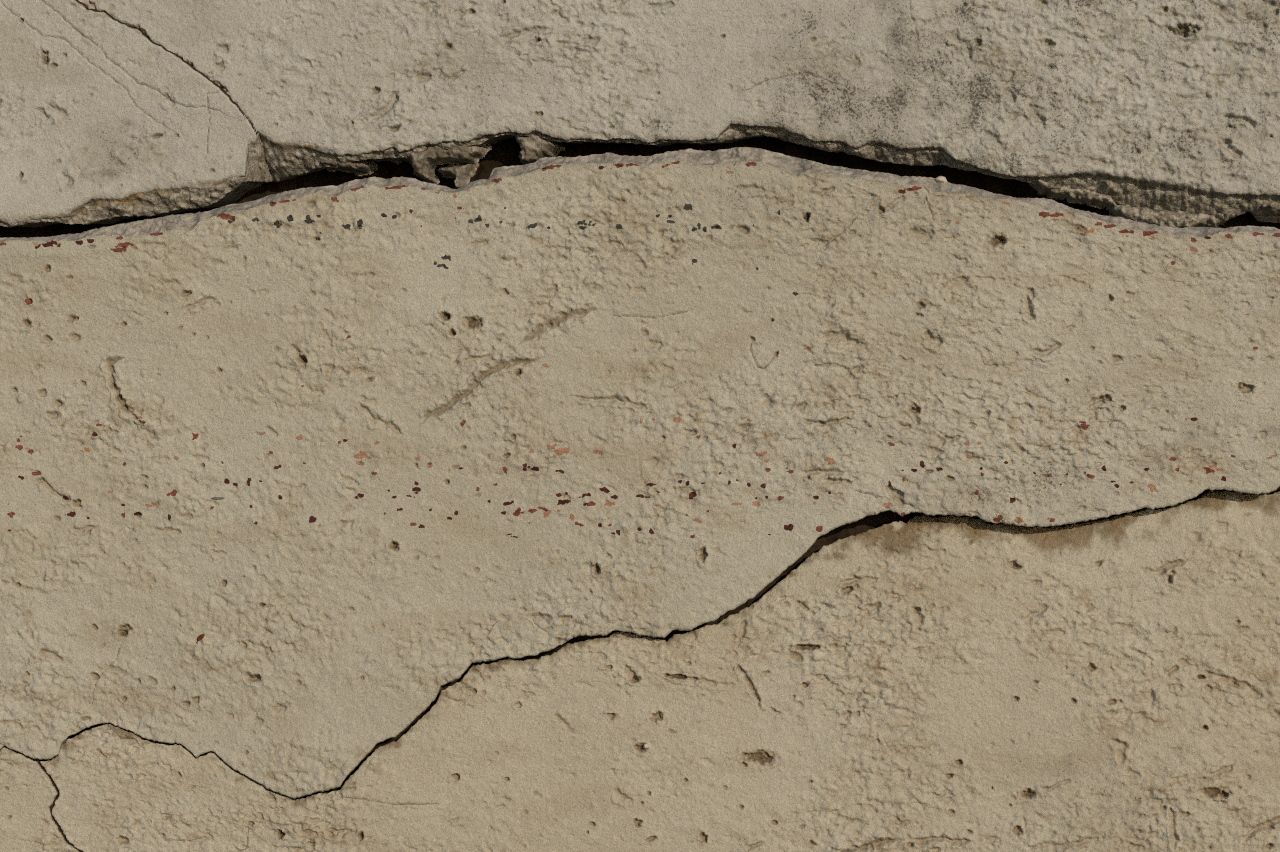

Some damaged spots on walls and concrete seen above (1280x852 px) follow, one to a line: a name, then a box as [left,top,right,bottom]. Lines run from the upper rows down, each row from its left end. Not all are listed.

crack [75,0,258,135]
crack [0,134,1280,238]
crack [297,487,1280,799]
crack [37,723,111,852]